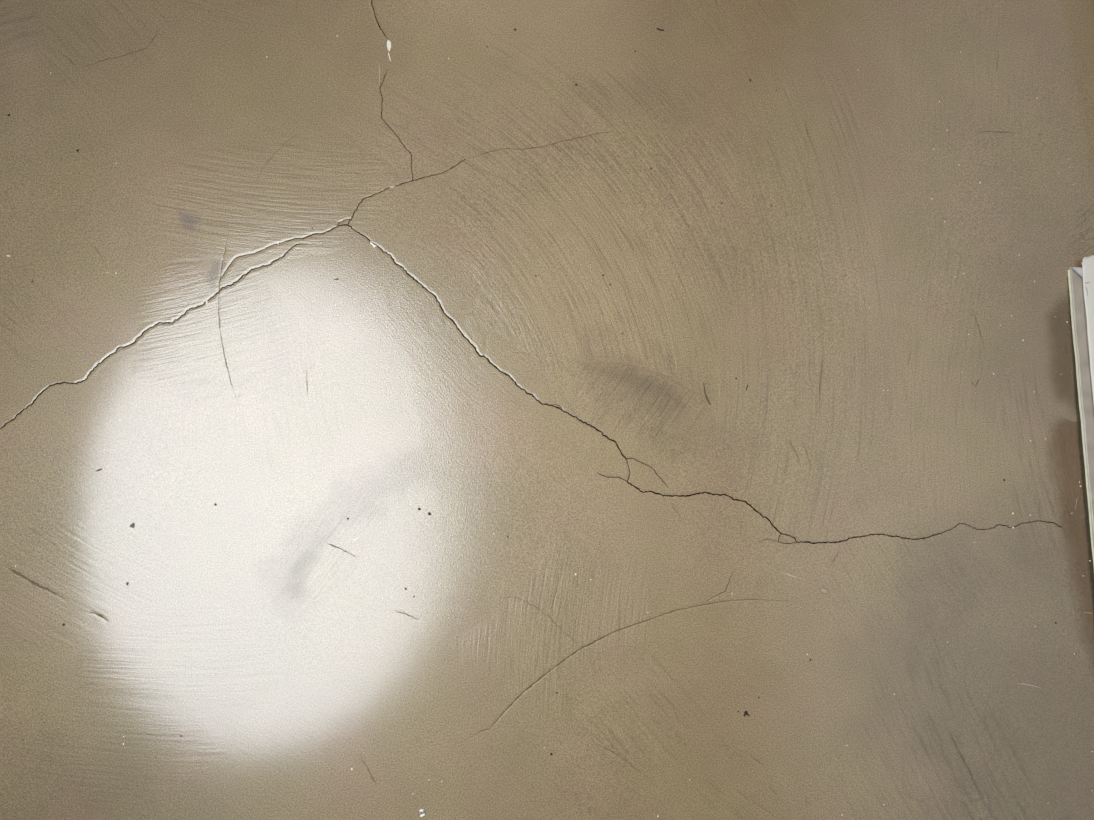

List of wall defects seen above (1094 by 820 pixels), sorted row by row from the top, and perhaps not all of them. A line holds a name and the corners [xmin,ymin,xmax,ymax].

crack [0,70,1082,544]